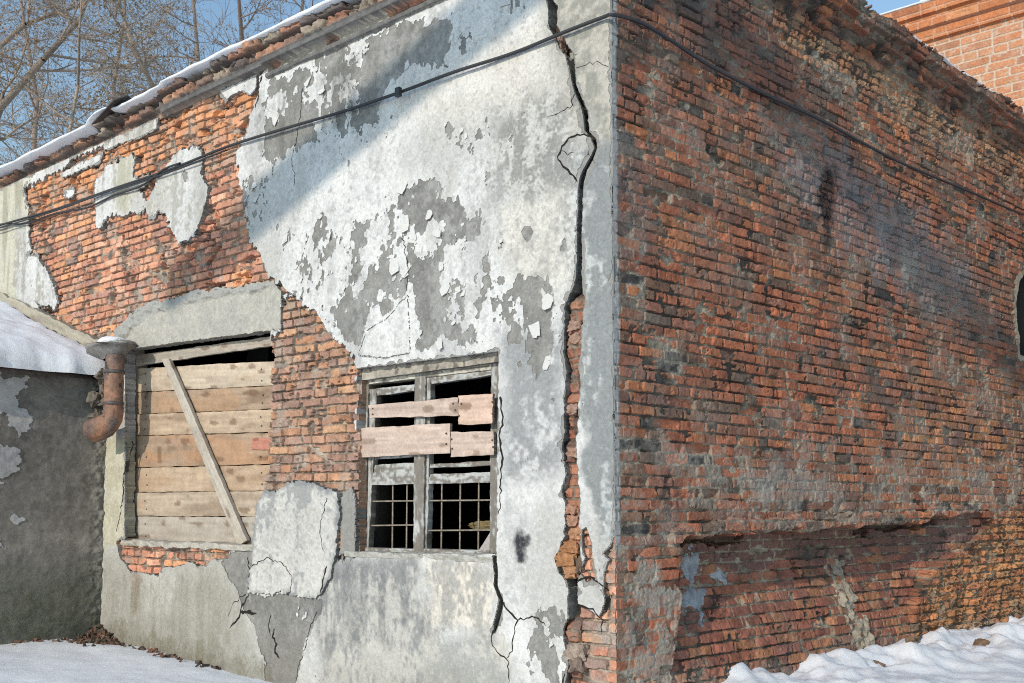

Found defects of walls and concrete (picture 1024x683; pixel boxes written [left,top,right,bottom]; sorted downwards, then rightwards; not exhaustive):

crack [551,2,608,116]
crack [557,133,597,181]
flaking render [0,0,627,683]
crack [491,292,611,683]
crack [228,498,327,679]
spalling [670,507,1024,683]